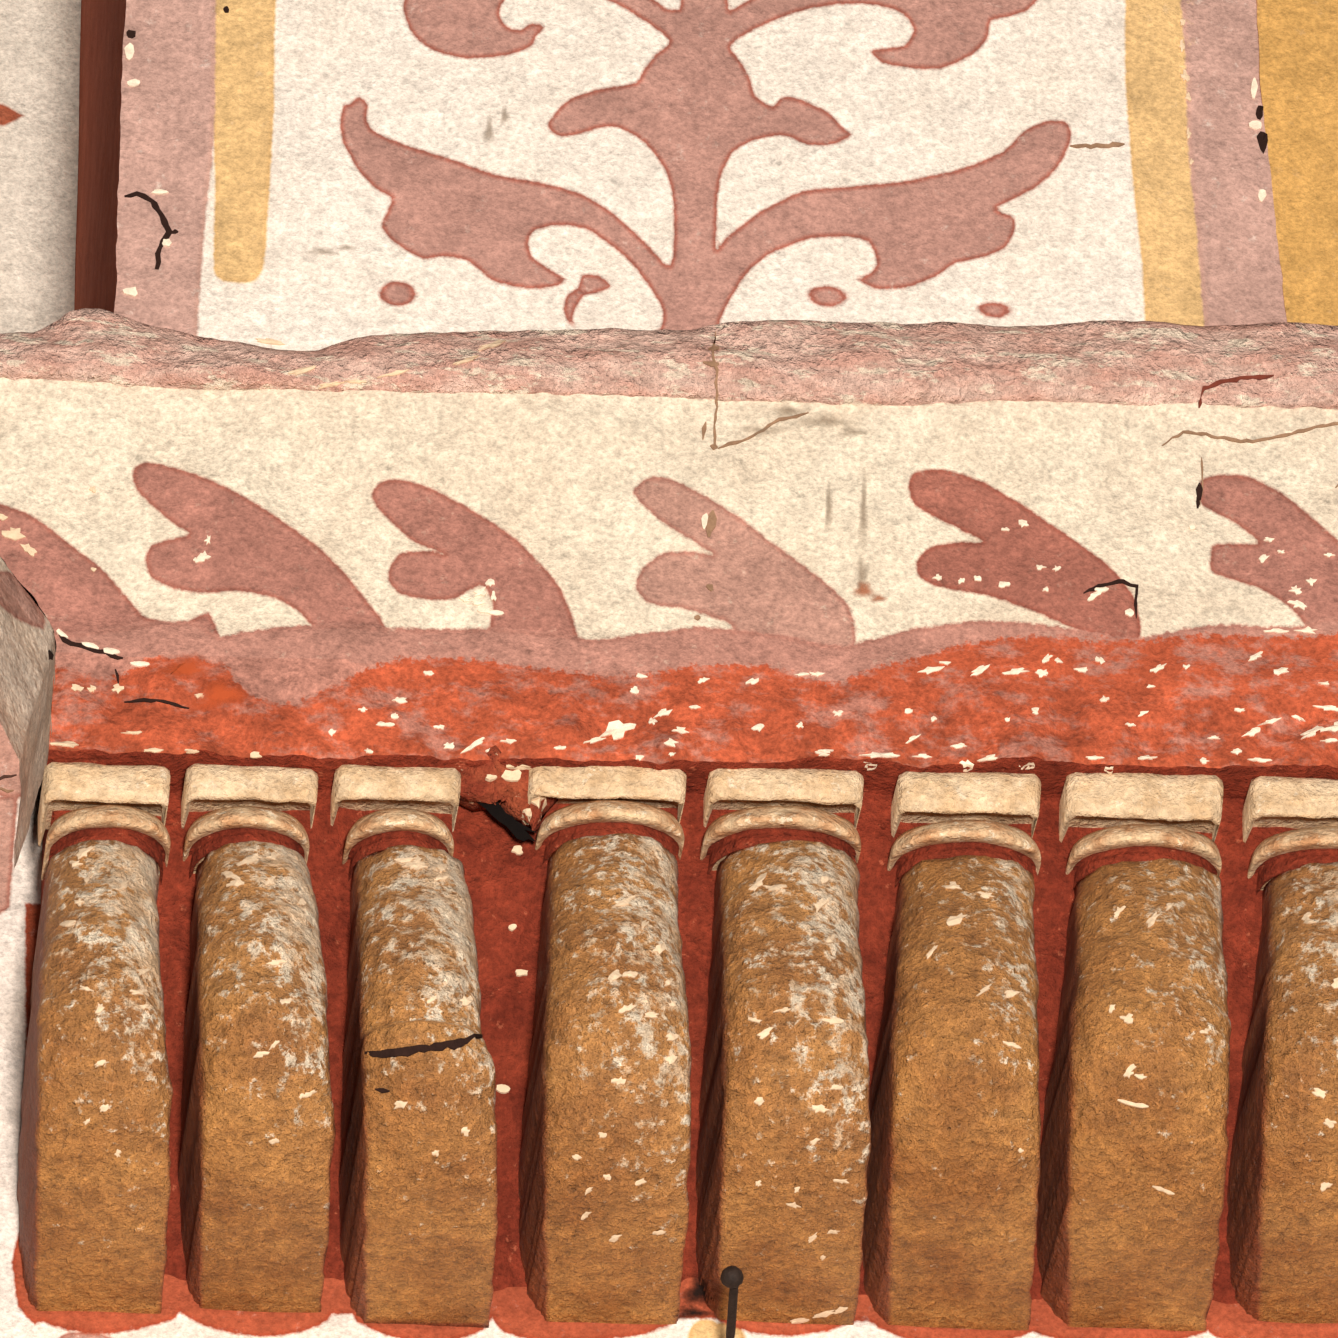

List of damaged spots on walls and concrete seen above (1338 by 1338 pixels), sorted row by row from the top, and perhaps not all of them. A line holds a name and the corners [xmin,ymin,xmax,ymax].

crack [122,189,178,297]
crack [702,331,809,450]
crack [1162,374,1338,530]
crack [701,510,717,537]
crack [1083,579,1139,618]
peeling [970,653,1105,678]
peeling [376,697,407,727]
peeling [583,708,689,757]
peeling [859,734,932,770]
peeling [950,743,998,772]
peeling [1231,705,1338,763]
crack [365,1034,483,1093]